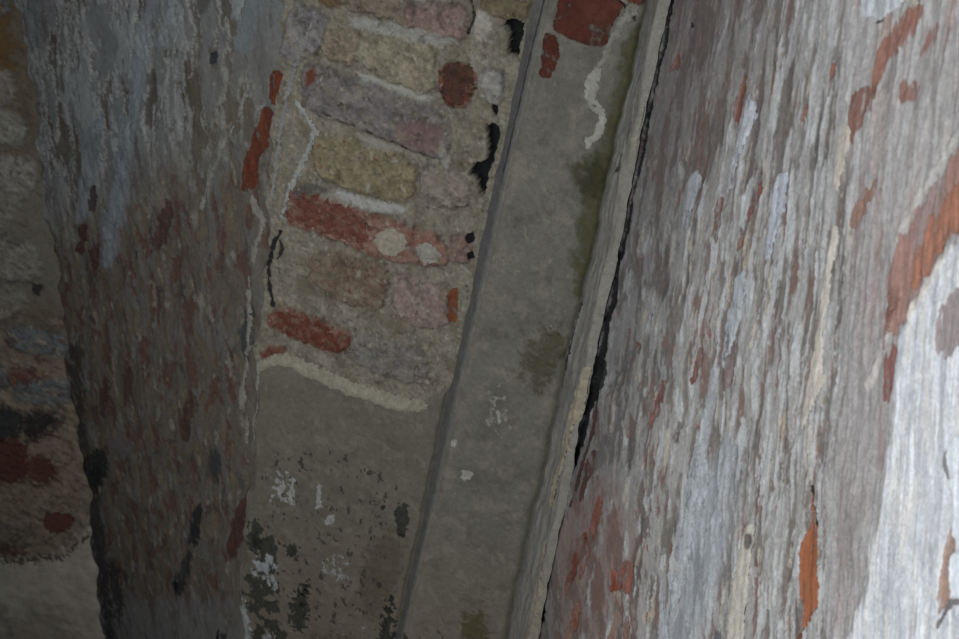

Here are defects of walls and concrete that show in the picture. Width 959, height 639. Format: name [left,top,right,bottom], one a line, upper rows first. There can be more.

spalling [241,22,442,264]
crack [501,0,545,183]
leakage [584,3,639,149]
crack [267,230,284,307]
crack [569,0,674,507]
spalling [883,147,959,403]
leakage [240,445,410,639]
peeling [238,276,428,444]
leakage [461,470,474,483]
leakage [485,383,512,438]
crack [538,583,548,639]
flaking render [797,485,820,639]